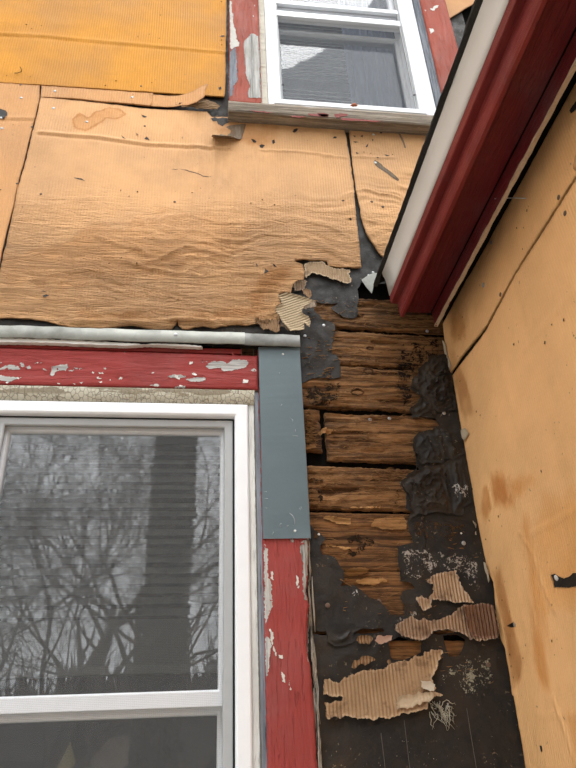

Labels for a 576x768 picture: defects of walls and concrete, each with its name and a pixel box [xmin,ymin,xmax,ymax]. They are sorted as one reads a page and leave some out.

peeling [228,1,261,99]
peeling [0,360,82,384]
peeling [168,353,257,389]
peeling [263,544,273,622]
peeling [290,538,309,600]